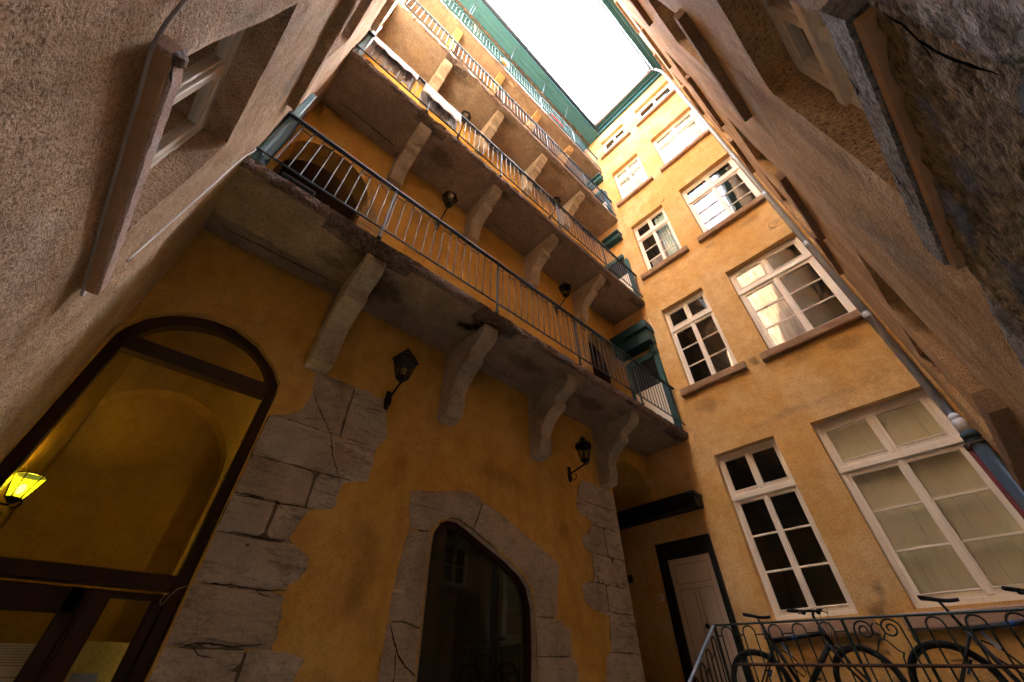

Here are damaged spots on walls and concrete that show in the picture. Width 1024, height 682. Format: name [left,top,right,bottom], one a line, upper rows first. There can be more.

crack [882,12,1003,77]
crack [305,388,340,482]
flaking render [147,373,388,682]
flaking render [576,480,645,682]
crack [390,625,416,682]